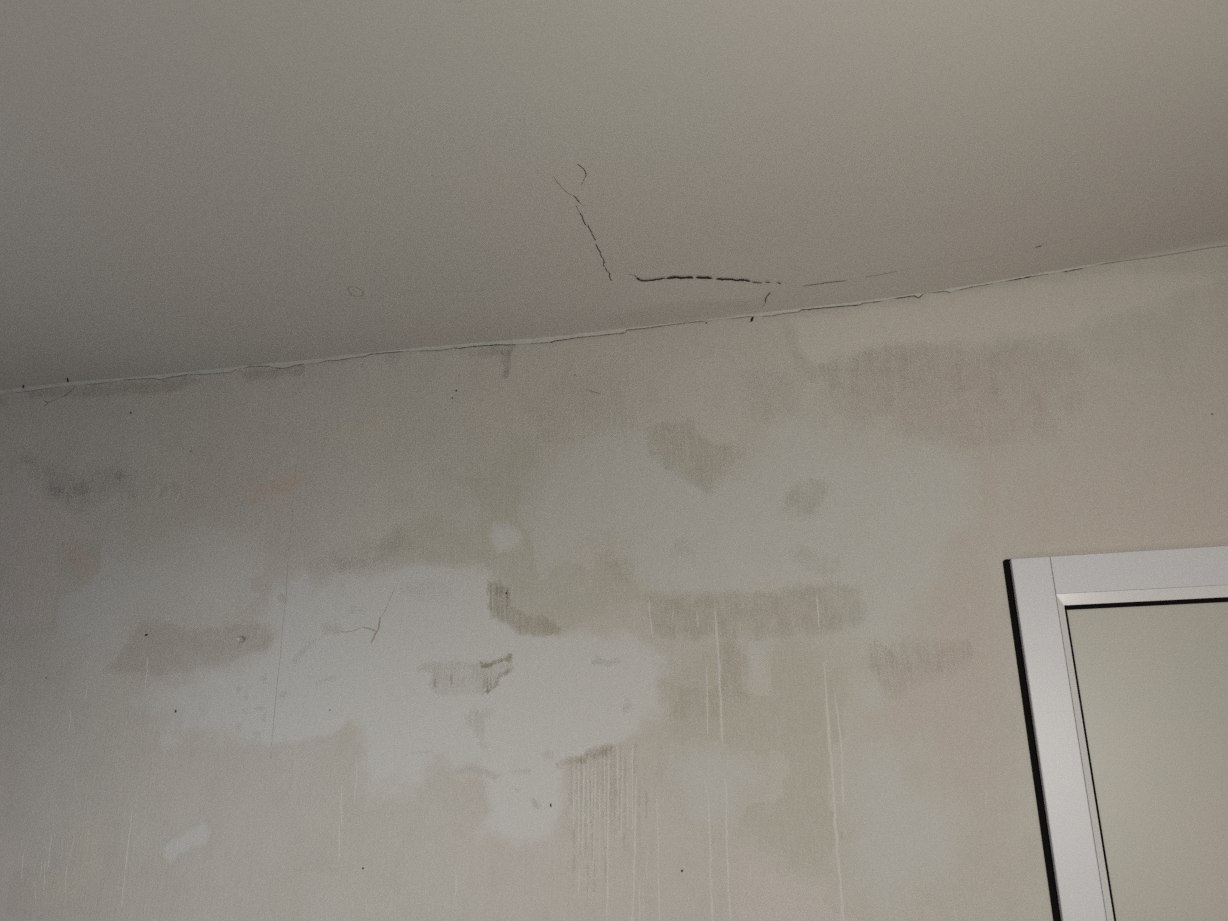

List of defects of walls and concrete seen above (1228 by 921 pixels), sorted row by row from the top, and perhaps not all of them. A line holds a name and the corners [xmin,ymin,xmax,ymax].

crack [426,164,1119,351]